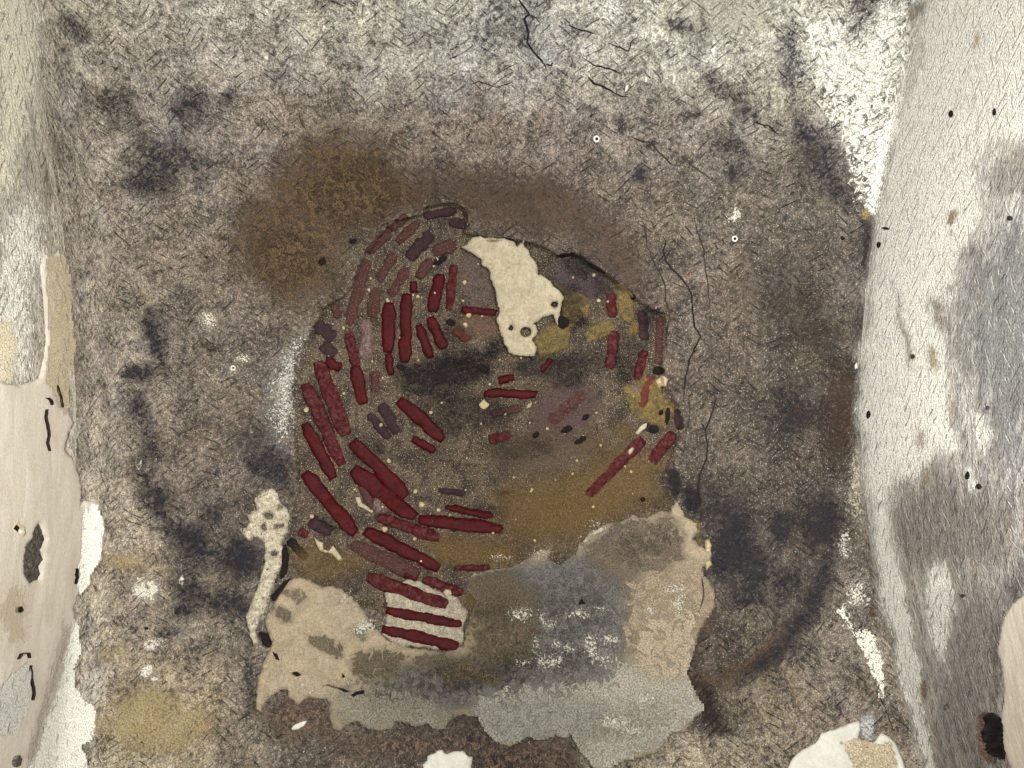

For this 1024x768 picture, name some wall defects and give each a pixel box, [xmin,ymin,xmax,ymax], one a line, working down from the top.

crack [519,0,553,73]
crack [568,25,636,97]
crack [724,121,776,142]
damp [217,126,648,309]
crack [637,213,717,506]
peeling [779,0,1024,768]
spalling [286,203,684,651]
spalling [12,519,44,583]
peeling [0,662,32,735]
spalling [12,755,22,767]